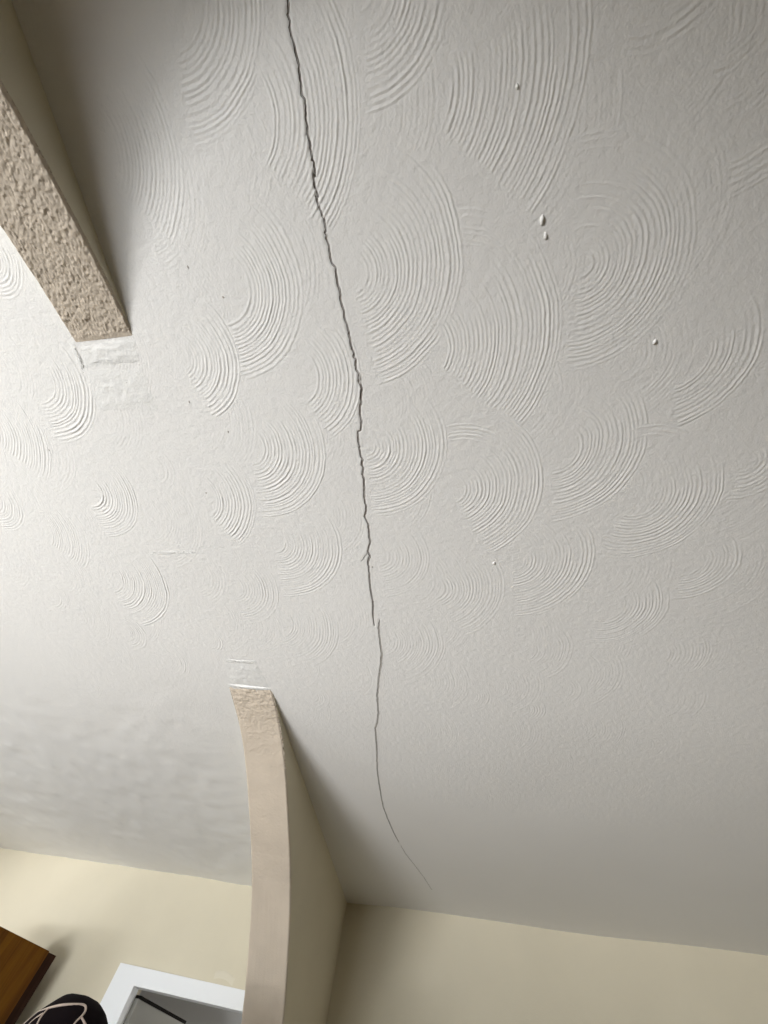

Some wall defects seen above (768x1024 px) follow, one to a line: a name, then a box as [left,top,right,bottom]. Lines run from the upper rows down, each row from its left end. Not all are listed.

crack [286,0,432,890]